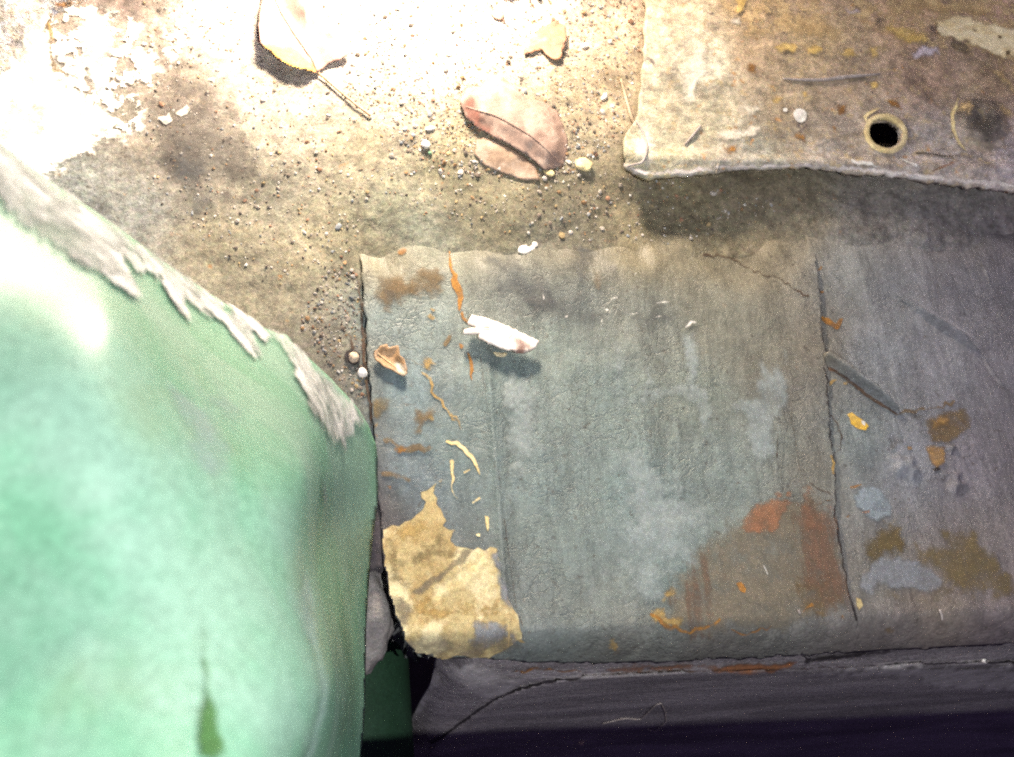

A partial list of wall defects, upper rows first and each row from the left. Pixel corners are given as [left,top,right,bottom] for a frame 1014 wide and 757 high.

peeling [724,0,838,53]
peeling [852,0,1014,63]
peeling [682,47,706,102]
peeling [721,126,759,139]
rust [449,251,468,323]
rust [443,335,474,380]
rust [422,359,460,424]
rust [384,412,433,452]
crack [703,253,857,621]
peeling [382,440,522,660]
crack [802,650,1014,668]
crack [430,674,584,745]